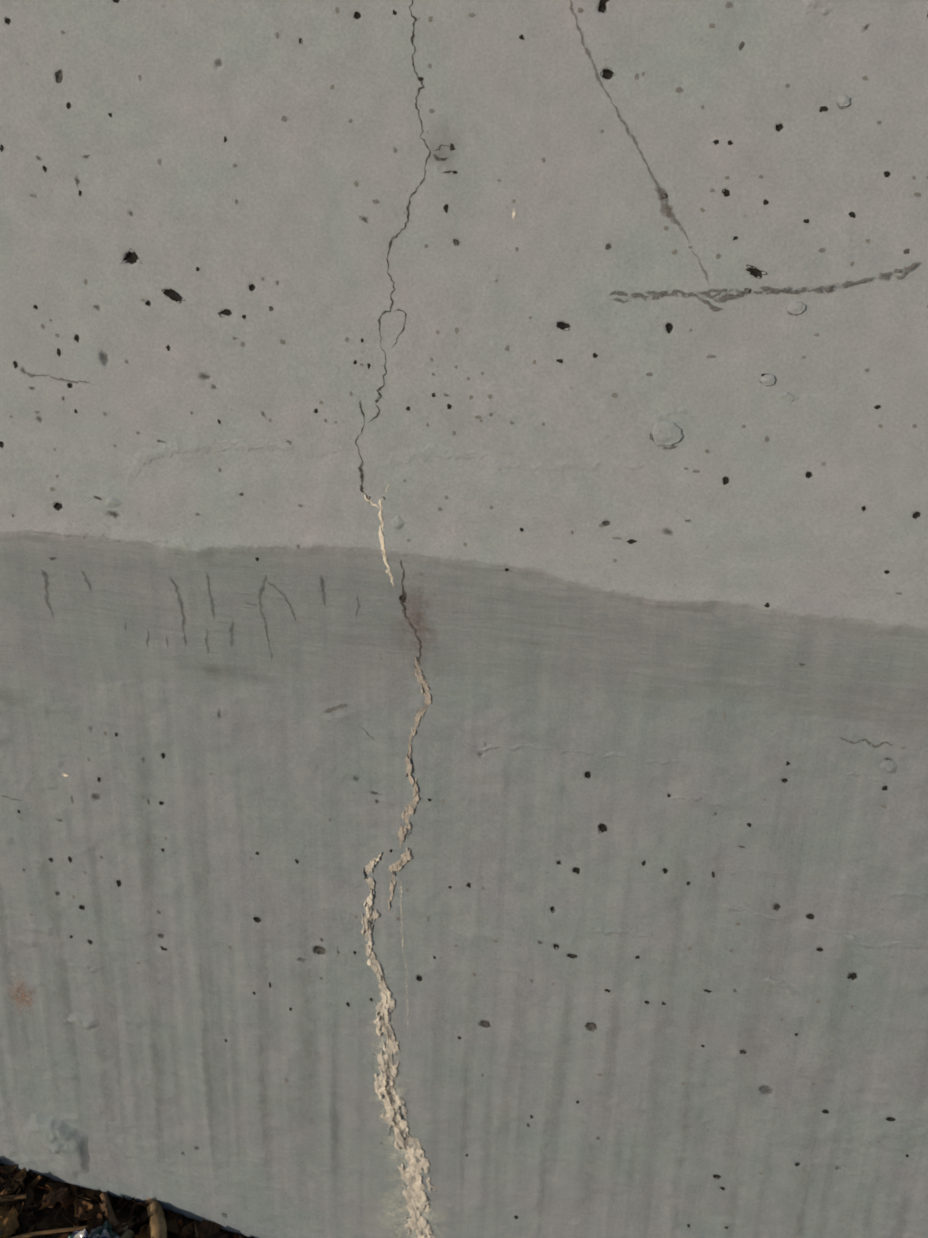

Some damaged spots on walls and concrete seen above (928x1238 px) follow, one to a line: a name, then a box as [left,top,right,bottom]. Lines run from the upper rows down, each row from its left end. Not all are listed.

crack [355,0,451,1238]